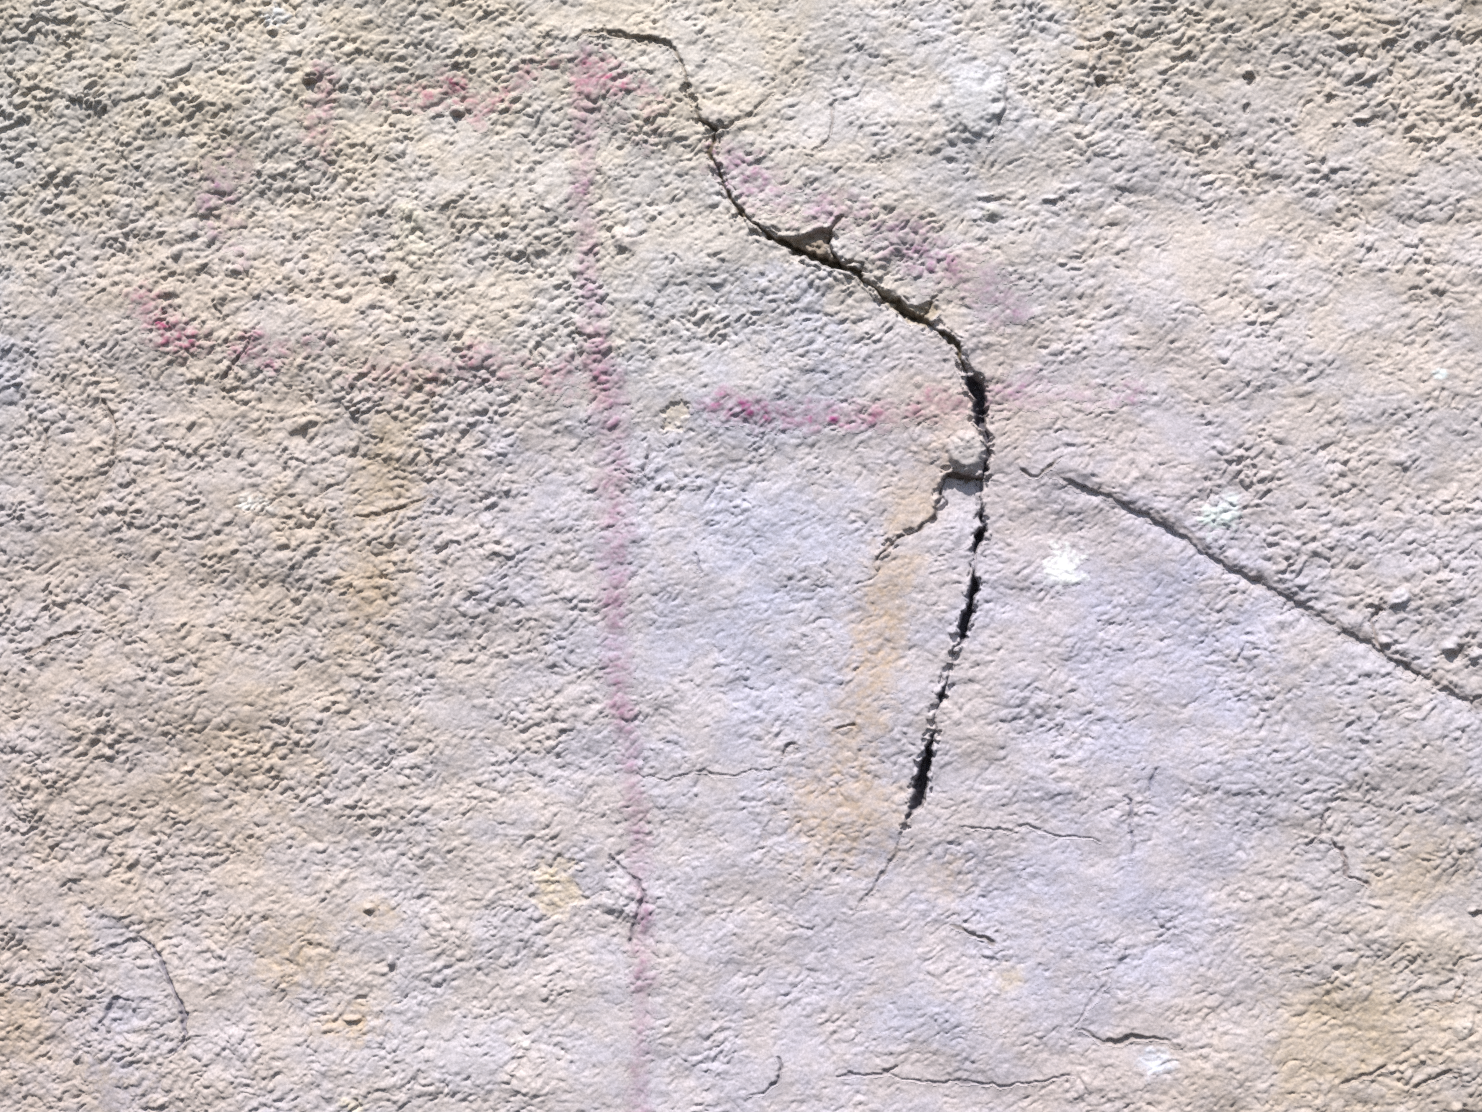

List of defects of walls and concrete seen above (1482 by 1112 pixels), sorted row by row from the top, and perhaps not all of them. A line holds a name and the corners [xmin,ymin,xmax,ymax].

crack [572,26,1482,910]